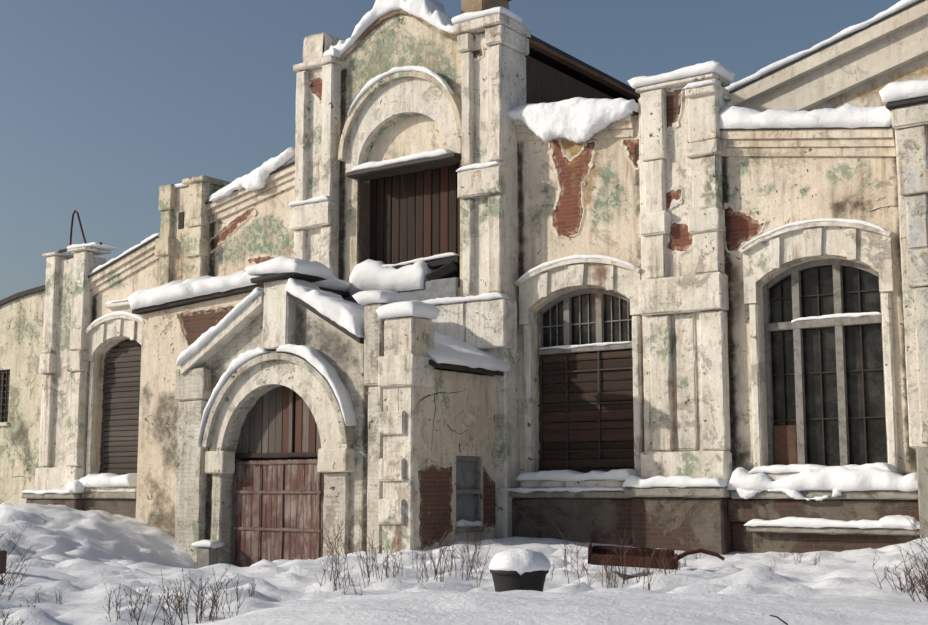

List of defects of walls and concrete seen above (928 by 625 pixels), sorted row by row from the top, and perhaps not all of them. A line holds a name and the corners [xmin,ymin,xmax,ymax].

spalling [308,75,322,104]
spalling [665,86,685,132]
spalling [532,139,626,241]
spalling [209,205,293,266]
spalling [666,186,693,256]
spalling [723,202,770,255]
spalling [175,301,241,347]
damp [14,424,29,457]
crack [397,387,467,451]
spalling [415,459,456,550]
spalling [483,466,496,533]